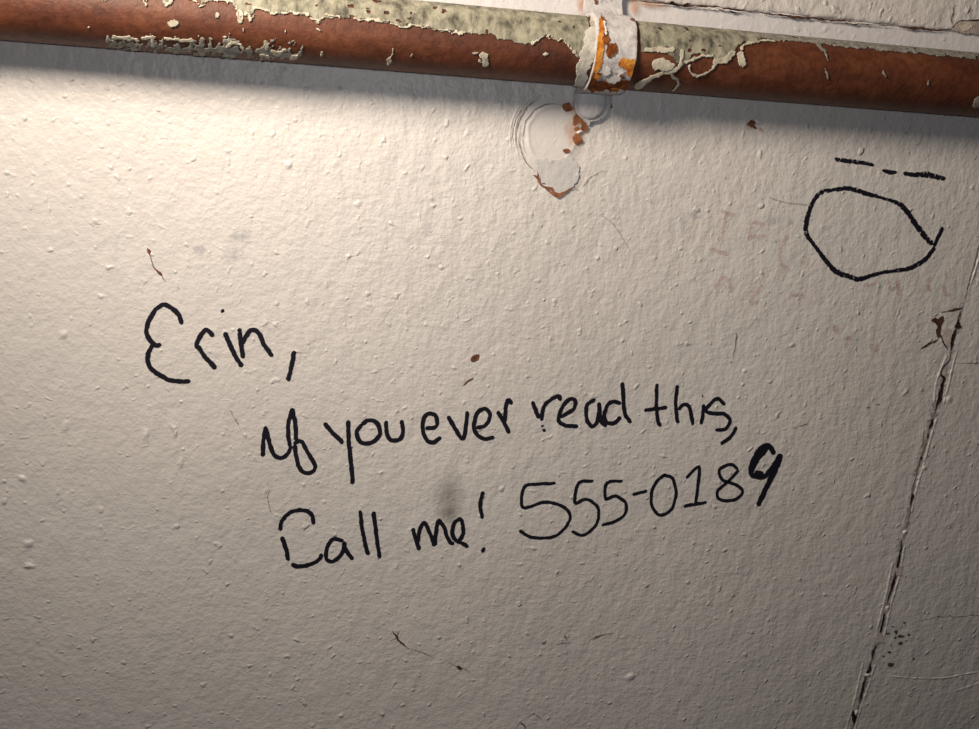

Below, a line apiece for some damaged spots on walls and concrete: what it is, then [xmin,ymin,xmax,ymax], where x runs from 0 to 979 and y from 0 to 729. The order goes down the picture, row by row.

rust [587,0,635,108]
rust [562,102,588,153]
peeling [533,157,601,198]
crack [966,236,979,295]
peeling [921,308,962,349]
crack [845,328,979,729]